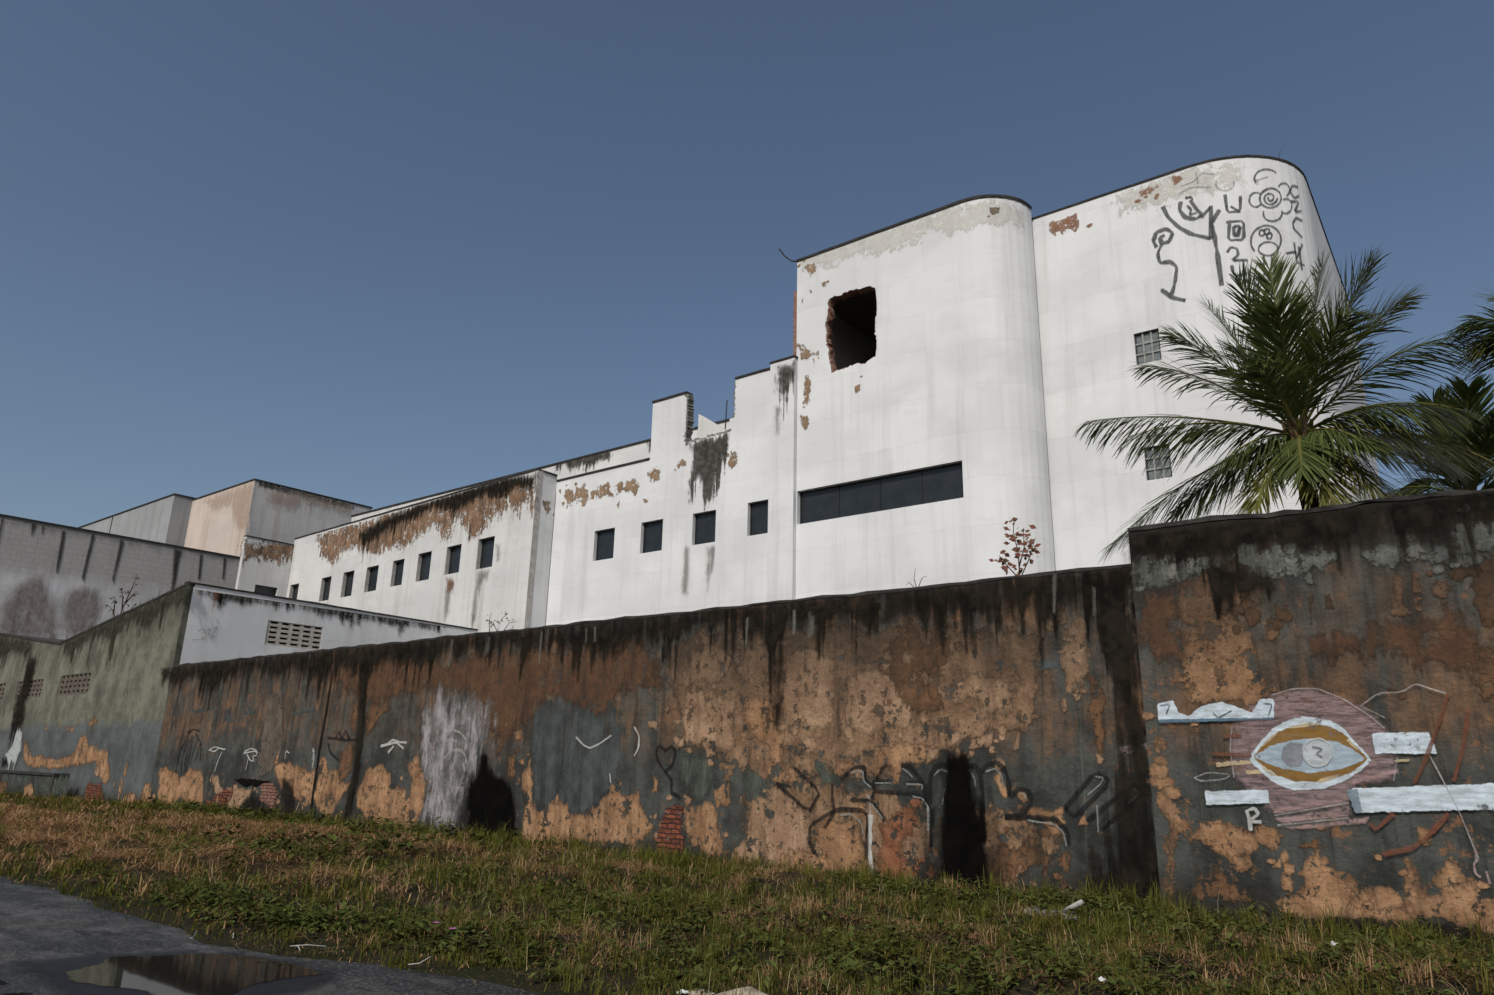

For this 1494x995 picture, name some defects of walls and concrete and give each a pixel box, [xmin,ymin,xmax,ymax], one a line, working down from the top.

flaking render [1049,213,1092,236]
damp [774,361,795,420]
damp [0,530,182,671]
peeling [238,538,294,571]
peeling [317,381,737,567]
damp [688,434,728,509]
damp [1391,491,1494,566]
damp [1,657,68,797]
peeling [0,609,1108,889]
damp [161,508,1360,907]
peeling [1142,711,1494,935]